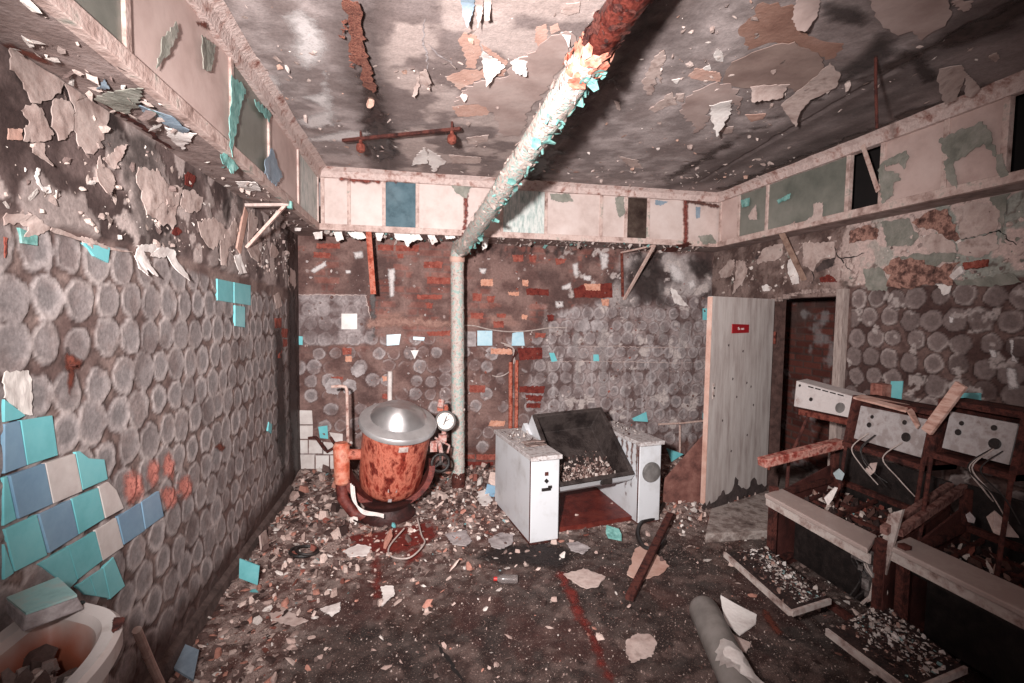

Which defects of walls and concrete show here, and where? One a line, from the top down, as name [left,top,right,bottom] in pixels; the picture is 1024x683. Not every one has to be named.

peeling [7,48,197,196]
peeling [220,75,283,191]
peeling [412,0,581,172]
peeling [641,0,844,137]
peeling [870,0,974,40]
peeling [3,213,50,258]
peeling [134,243,190,281]
peeling [136,167,279,274]
peeling [295,228,455,336]
peeling [719,241,837,294]
peeling [849,193,1021,295]
peeling [2,370,33,416]